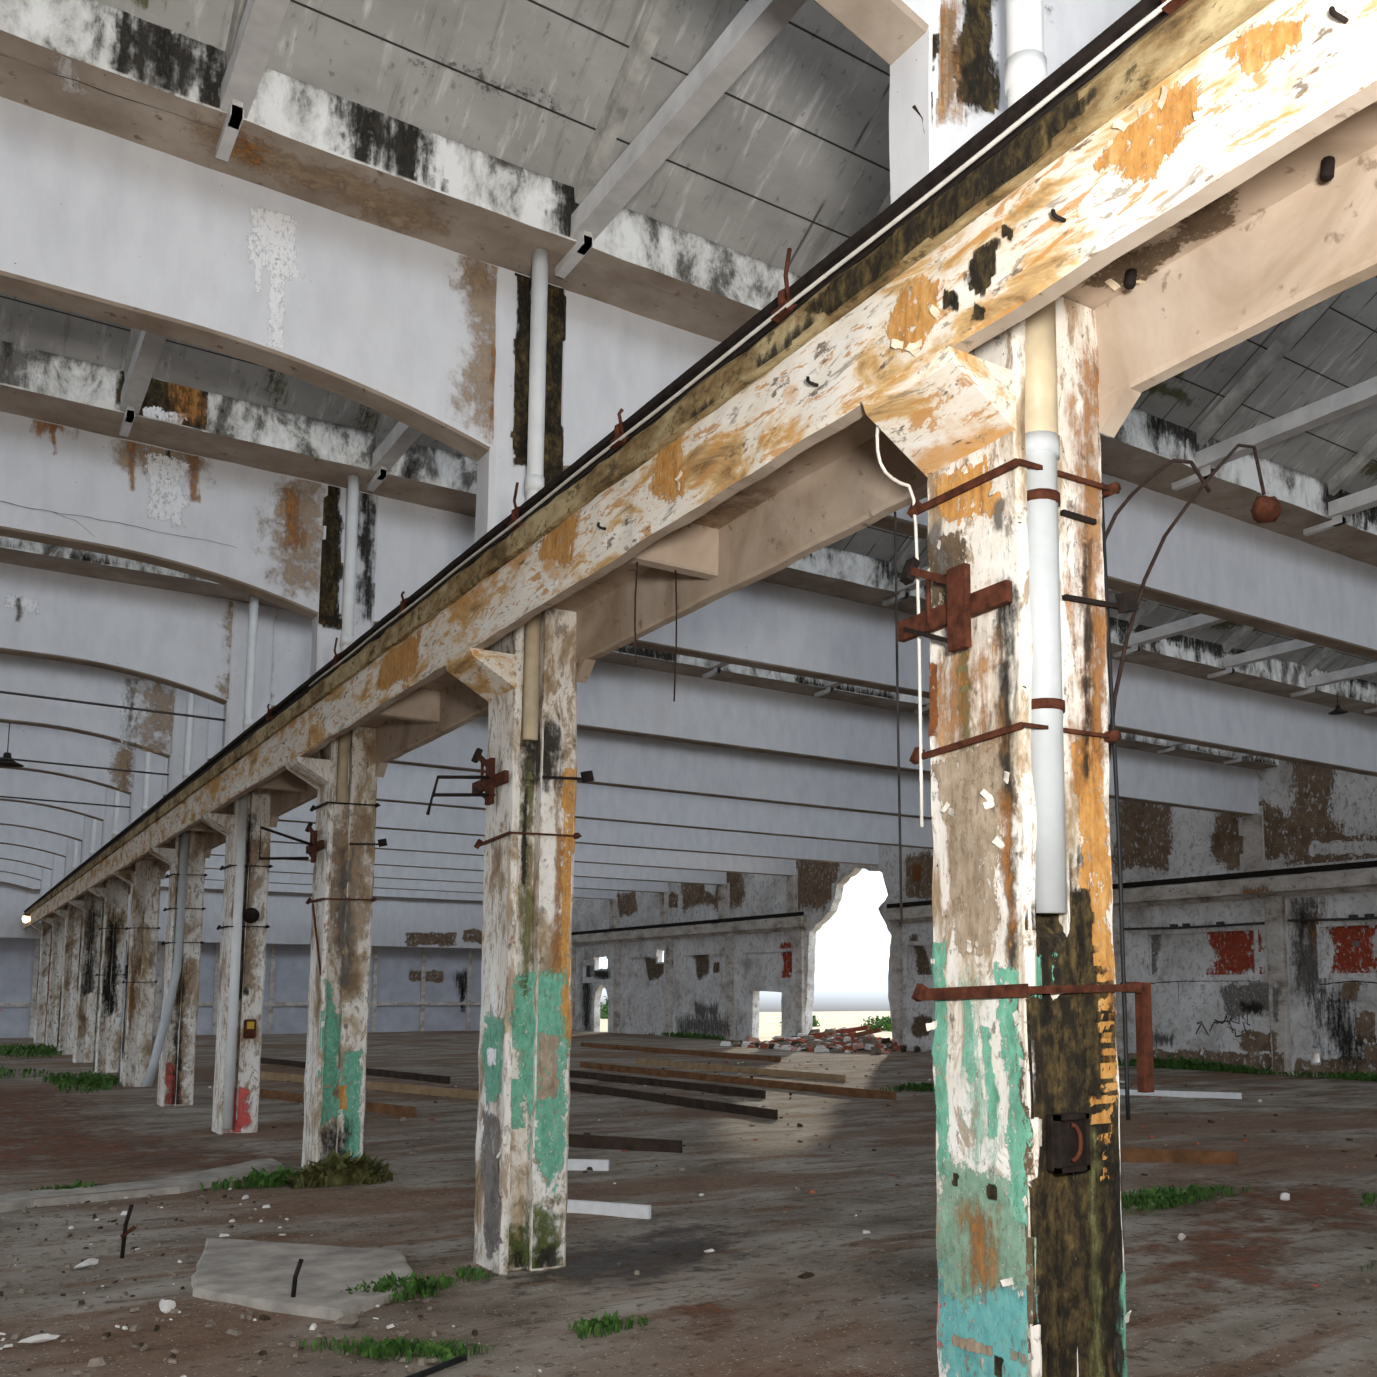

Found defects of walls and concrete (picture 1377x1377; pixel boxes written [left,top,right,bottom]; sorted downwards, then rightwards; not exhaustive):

water stain [935,0,1000,122]
peeling [1093,77,1207,184]
water stain [454,257,498,430]
water stain [511,273,566,486]
water stain [757,88,1096,368]
peeling [884,224,1013,356]
peeling [923,455,1004,609]
rust [1070,609,1118,1181]
peeling [480,967,570,1259]
peeling [905,740,1065,1377]
flaking render [1117,924,1377,1077]
water stain [1298,911,1326,1066]